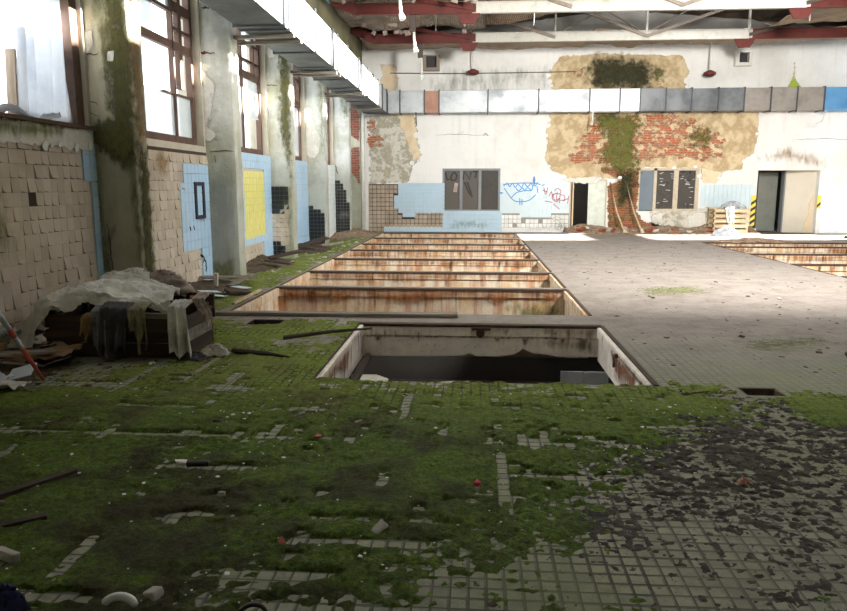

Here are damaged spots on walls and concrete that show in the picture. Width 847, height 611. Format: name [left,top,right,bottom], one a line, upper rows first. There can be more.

peeling [0,118,94,152]
peeling [350,103,425,185]
peeling [543,112,759,228]